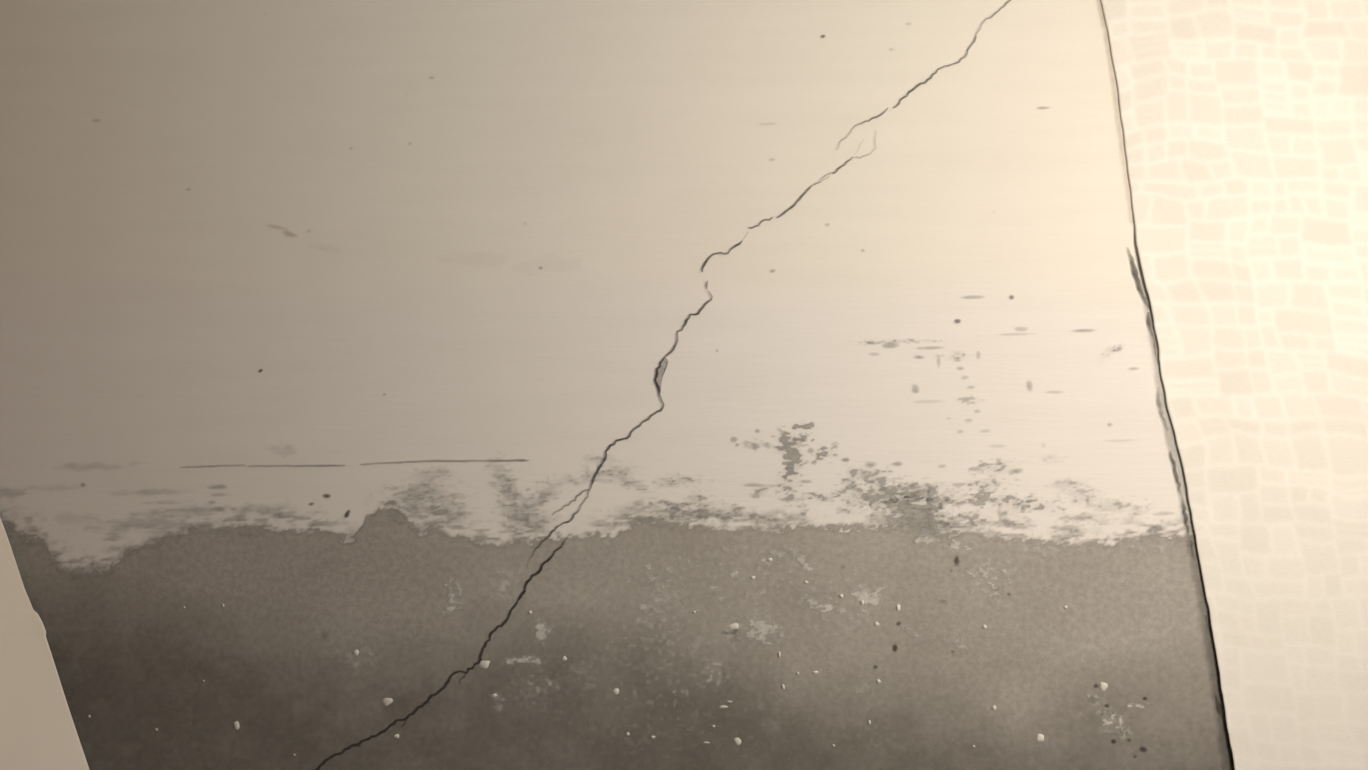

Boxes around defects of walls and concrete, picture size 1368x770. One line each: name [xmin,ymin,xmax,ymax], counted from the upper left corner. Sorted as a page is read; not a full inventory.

crack [863,0,1011,123]
crack [1130,255,1154,335]
crack [316,157,853,770]
crack [1171,458,1189,528]
water stain [50,648,838,770]